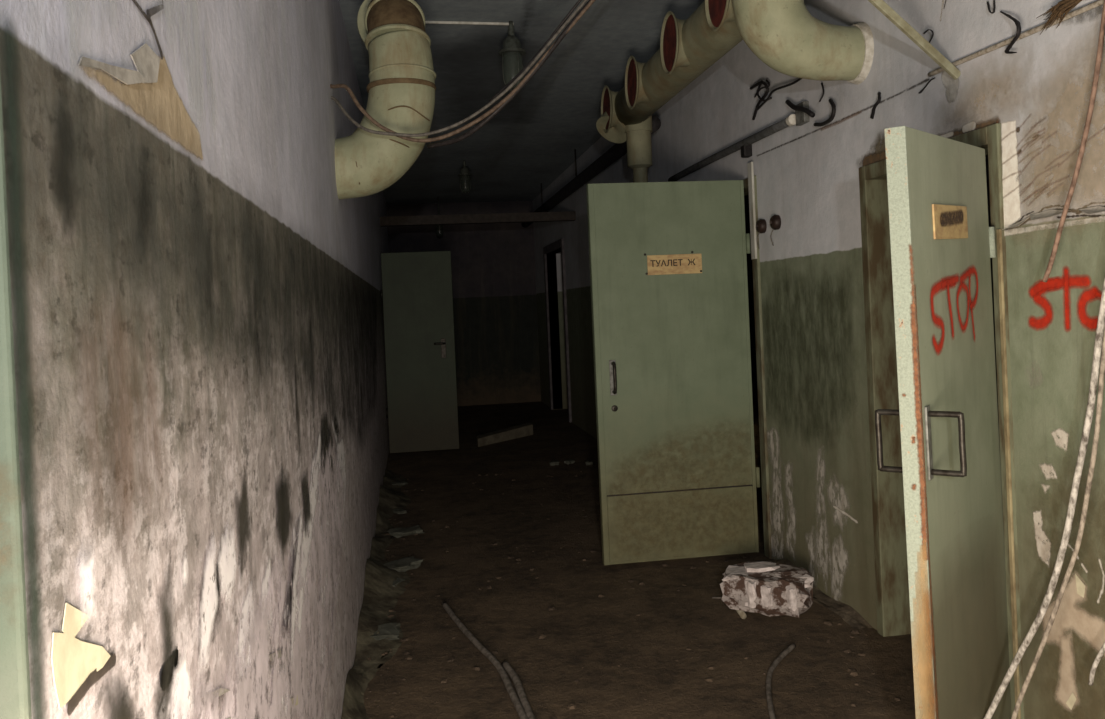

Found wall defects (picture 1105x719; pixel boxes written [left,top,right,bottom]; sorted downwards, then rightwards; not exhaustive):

damp [56,116,73,224]
damp [1031,60,1105,200]
damp [4,28,44,719]
damp [157,222,376,719]
corrosion [902,245,939,719]
damp [79,554,94,613]
damp [108,694,130,719]
peeling [1042,574,1105,710]